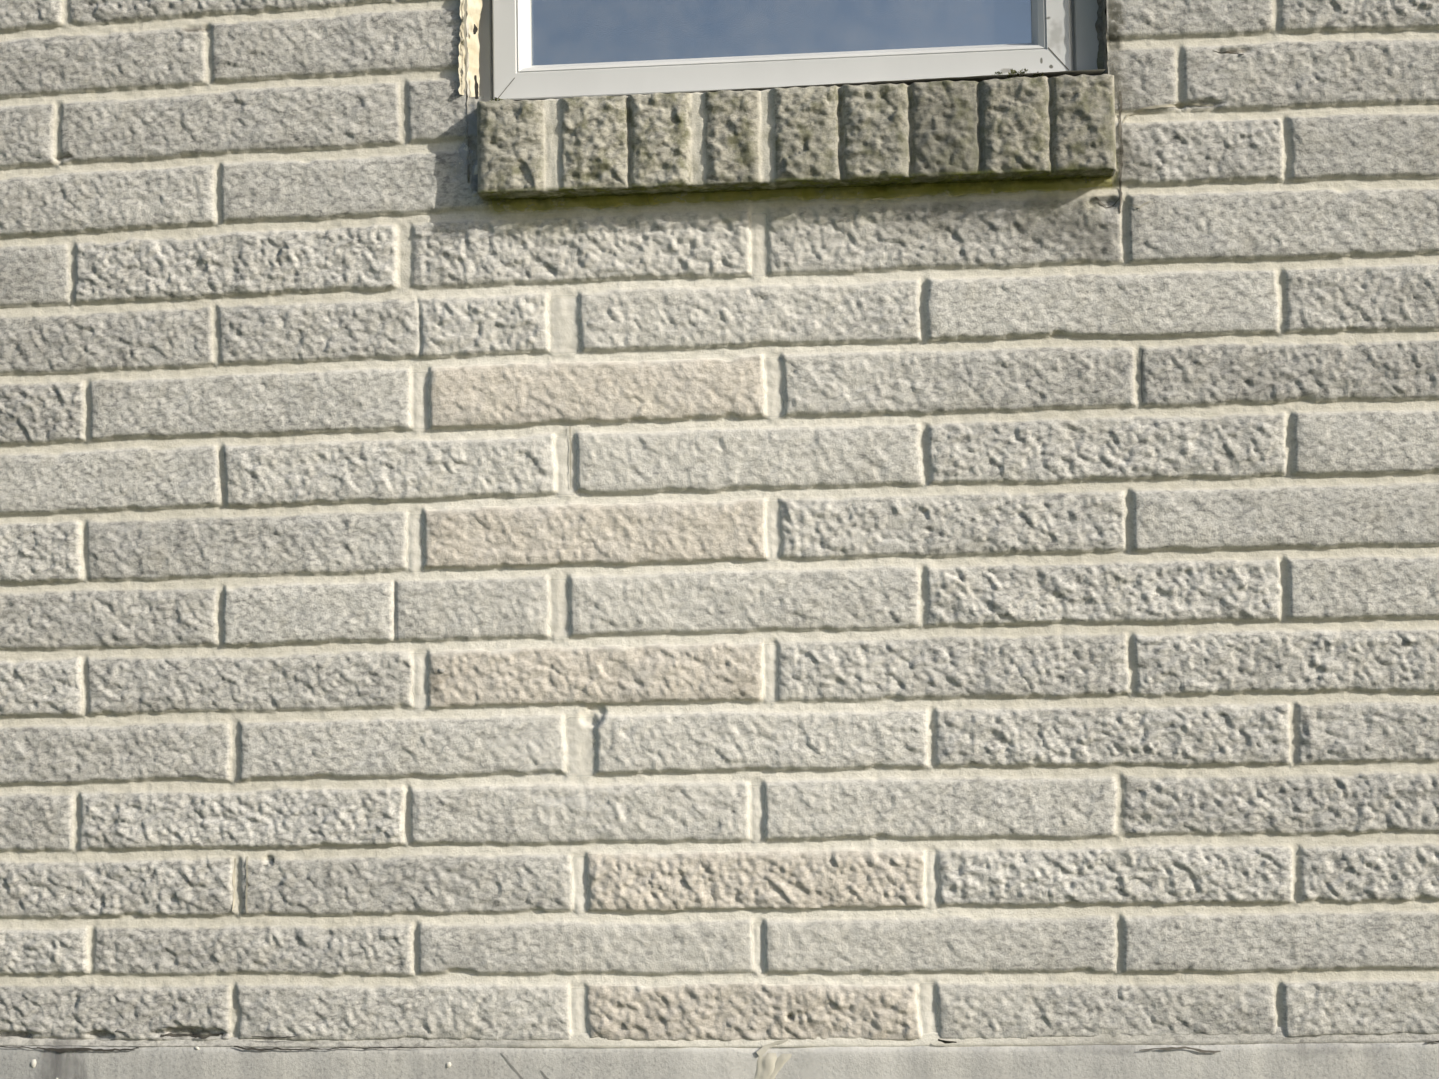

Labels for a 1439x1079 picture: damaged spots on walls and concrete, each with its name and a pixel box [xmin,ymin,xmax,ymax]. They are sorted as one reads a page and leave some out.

damp [51,1042,84,1079]
crack [752,1039,792,1079]